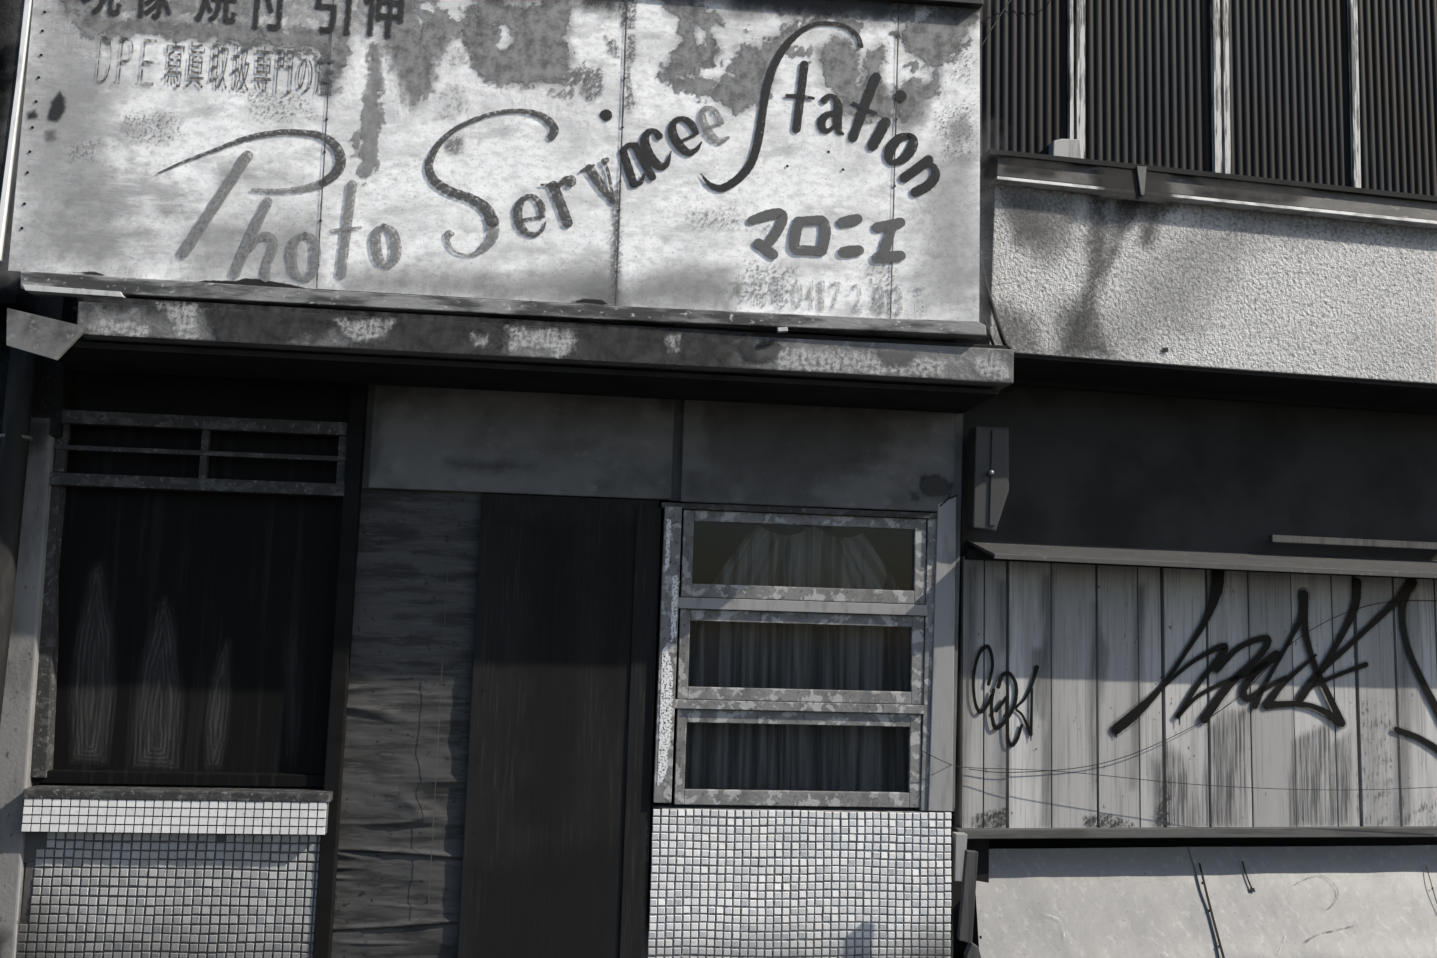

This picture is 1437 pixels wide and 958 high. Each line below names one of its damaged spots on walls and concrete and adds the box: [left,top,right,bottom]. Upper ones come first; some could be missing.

leakage [1060,195,1172,356]
leakage [996,308,1039,352]
leakage [976,807,1007,827]
leakage [1085,814,1133,827]
leakage [1157,778,1172,827]